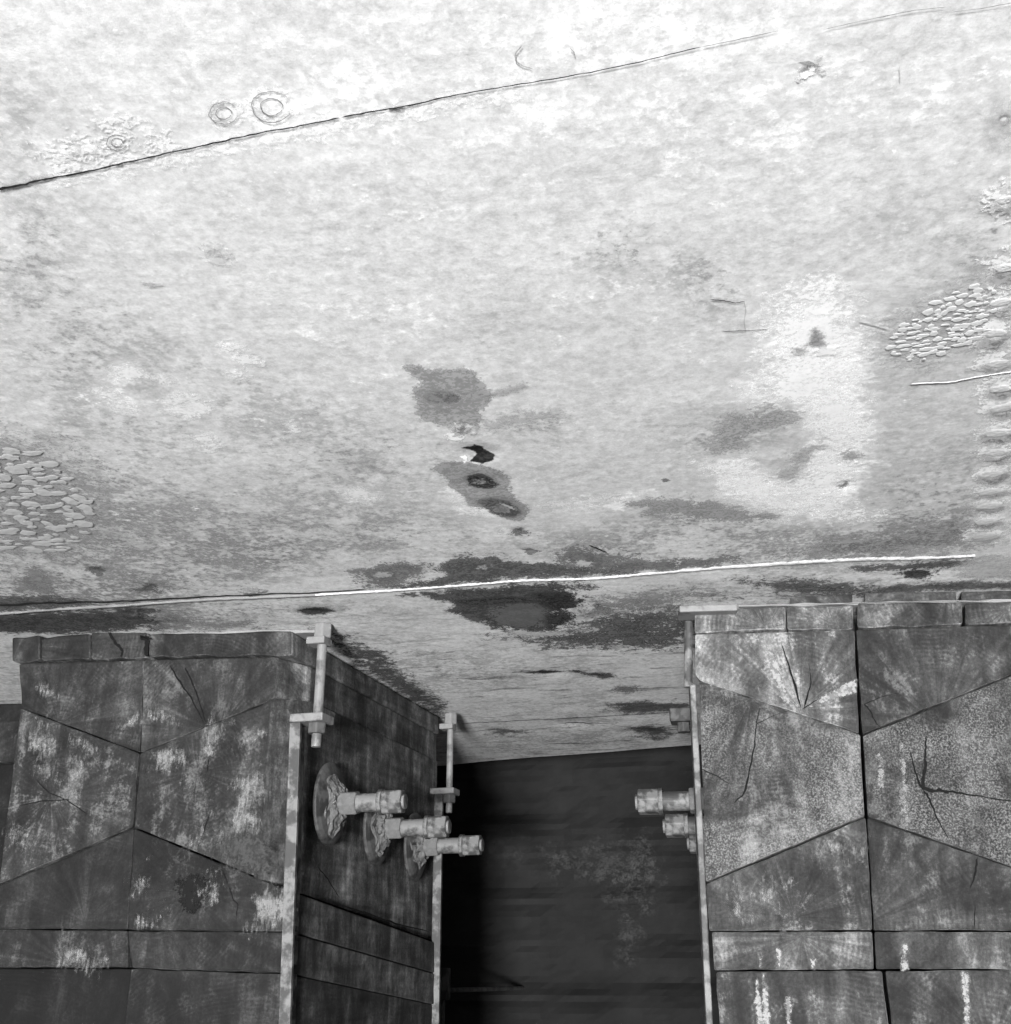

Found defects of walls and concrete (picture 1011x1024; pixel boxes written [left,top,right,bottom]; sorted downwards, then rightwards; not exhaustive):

crack [827,3,1011,29]
crack [0,31,776,190]
spalling [444,432,542,555]
water stain [344,267,1011,597]
water stain [481,582,707,654]